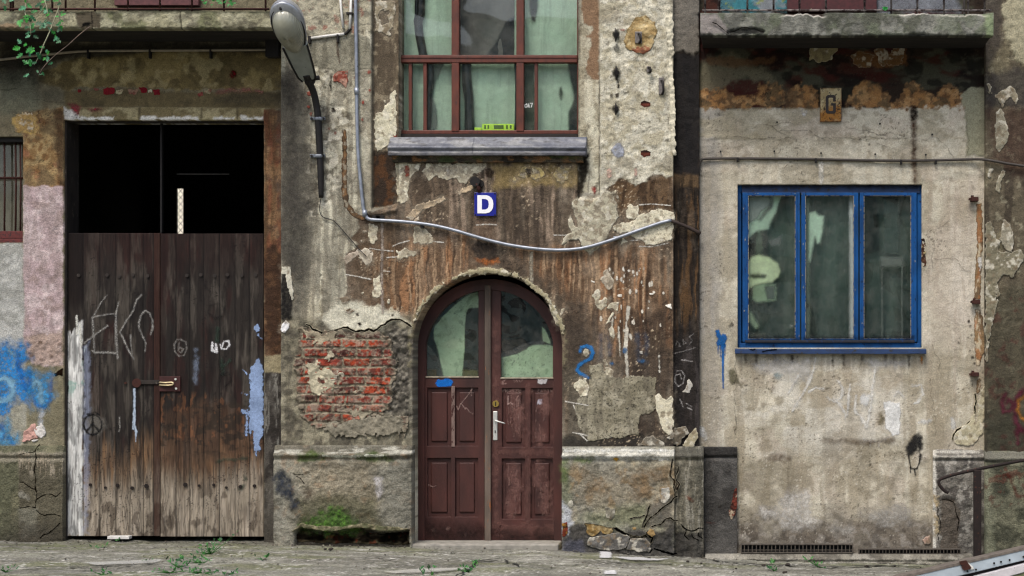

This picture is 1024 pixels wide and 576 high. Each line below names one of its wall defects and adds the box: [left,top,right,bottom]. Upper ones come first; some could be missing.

flaking render [851,48,905,68]
flaking render [374,90,398,151]
flaking render [987,83,1018,152]
flaking render [513,166,571,184]
flaking render [395,163,486,260]
flaking render [562,190,675,253]
flaking render [591,267,624,339]
flaking render [281,267,409,438]
flaking render [573,349,698,447]
flaking render [954,387,984,446]
crack [19,444,60,538]
crack [612,459,919,567]